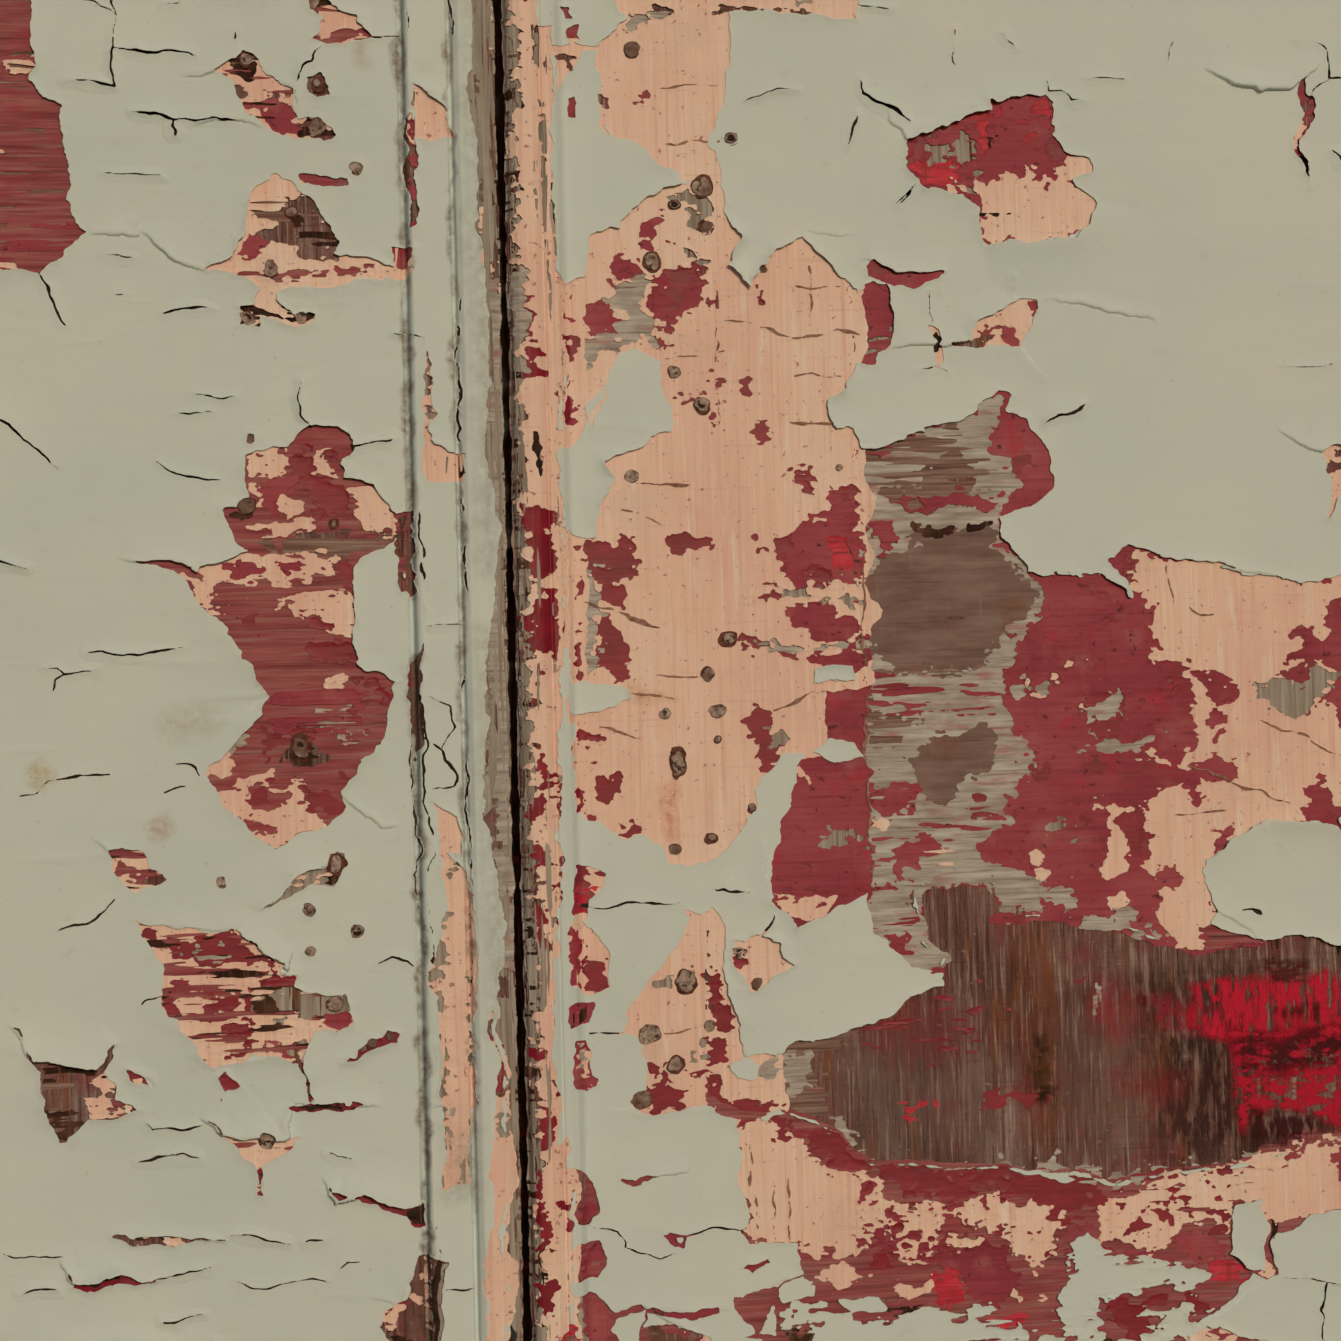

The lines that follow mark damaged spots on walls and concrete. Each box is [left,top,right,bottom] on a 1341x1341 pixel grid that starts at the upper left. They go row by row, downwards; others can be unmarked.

crack [77,0,236,136]
peeling [0,0,454,327]
peeling [420,0,1341,1341]
peeling [96,838,167,893]
peeling [128,425,425,1196]
peeling [14,1028,160,1143]
peeling [378,1253,449,1341]